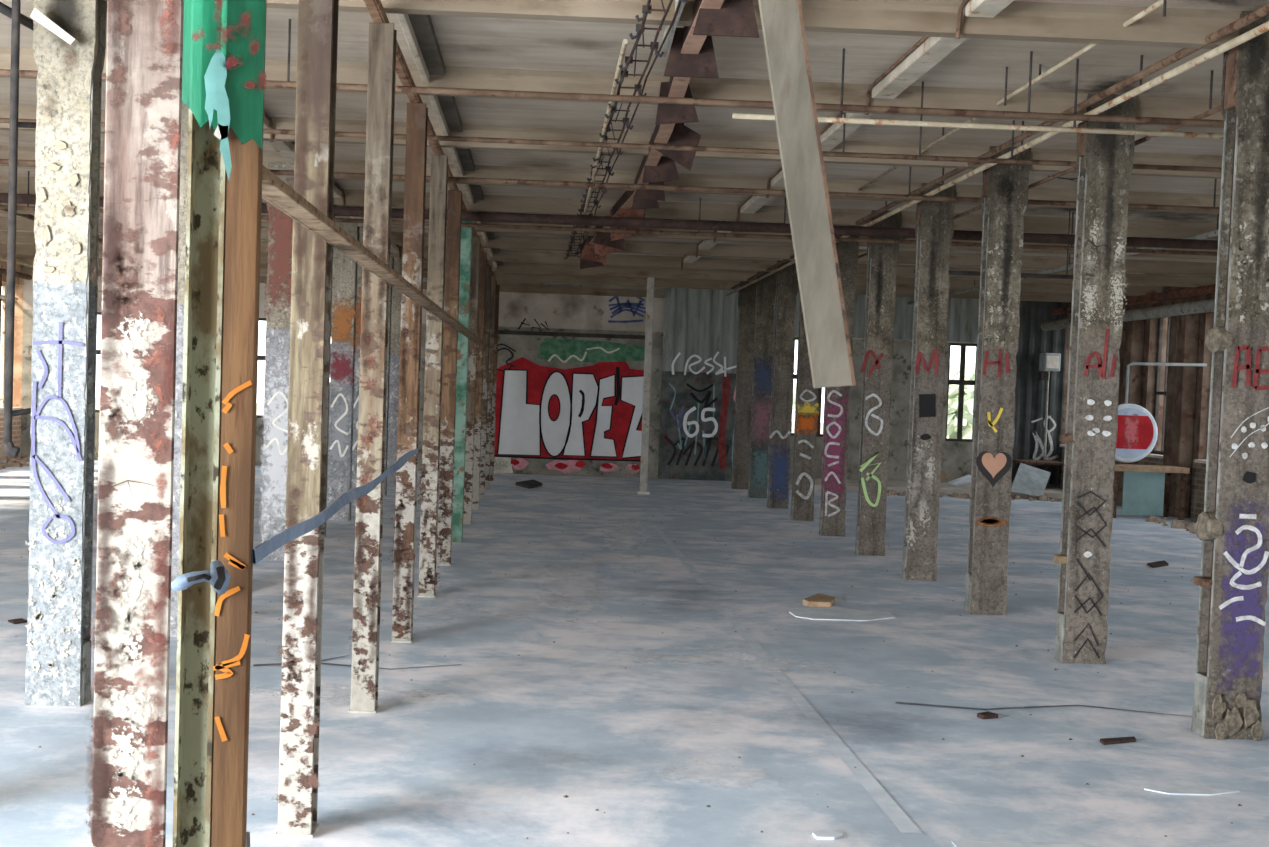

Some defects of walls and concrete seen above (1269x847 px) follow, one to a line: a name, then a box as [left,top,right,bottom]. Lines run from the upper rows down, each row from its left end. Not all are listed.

leakage [49,0,76,34]
peeling [214,125,228,140]
peeling [117,313,159,425]
peeling [114,536,154,671]
peeling [104,687,160,836]